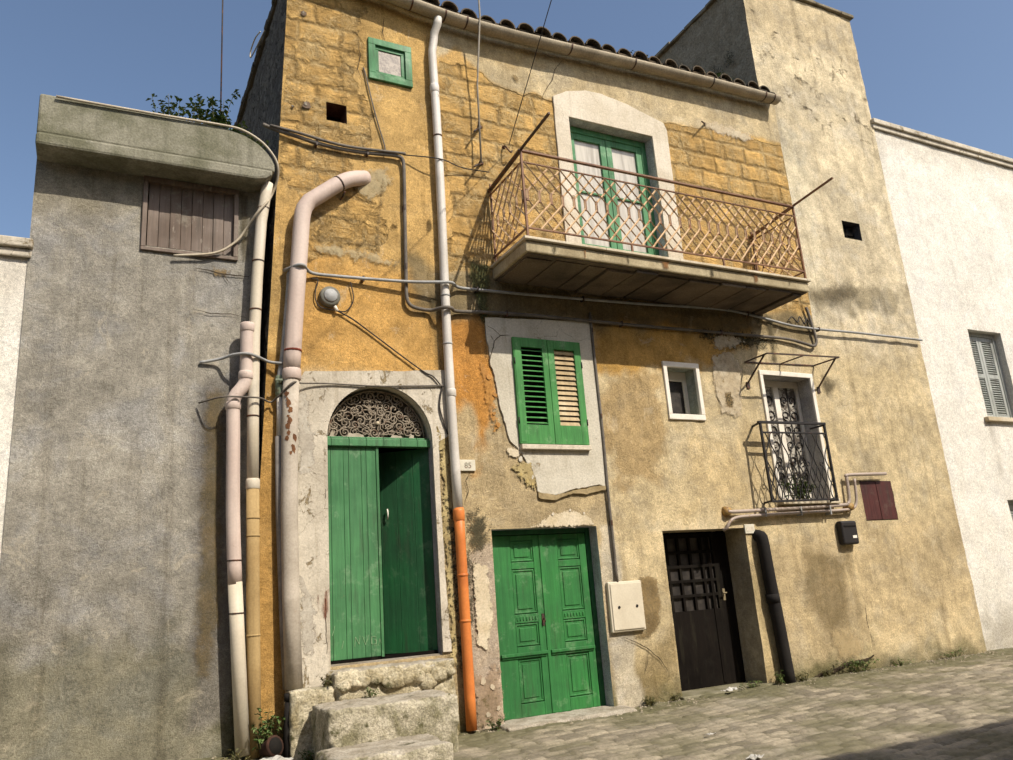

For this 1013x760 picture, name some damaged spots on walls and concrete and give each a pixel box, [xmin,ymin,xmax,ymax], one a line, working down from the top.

leakage [816,287,853,299]
rust [284,391,297,455]
peeling [480,317,606,528]
leakage [452,505,492,672]